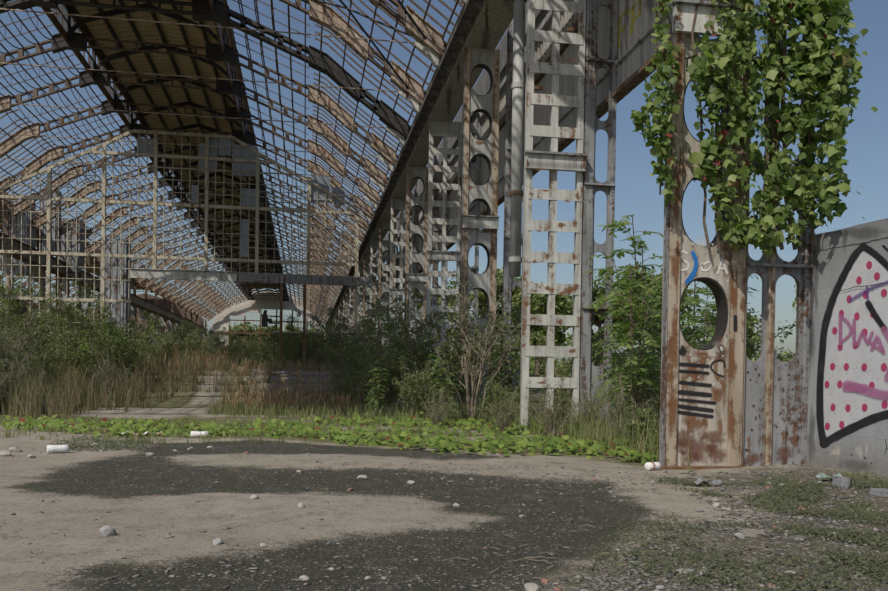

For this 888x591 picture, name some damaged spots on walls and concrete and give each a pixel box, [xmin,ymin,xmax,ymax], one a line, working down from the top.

corrosion [672,245,680,293]
corrosion [669,309,737,461]
corrosion [778,426,797,460]